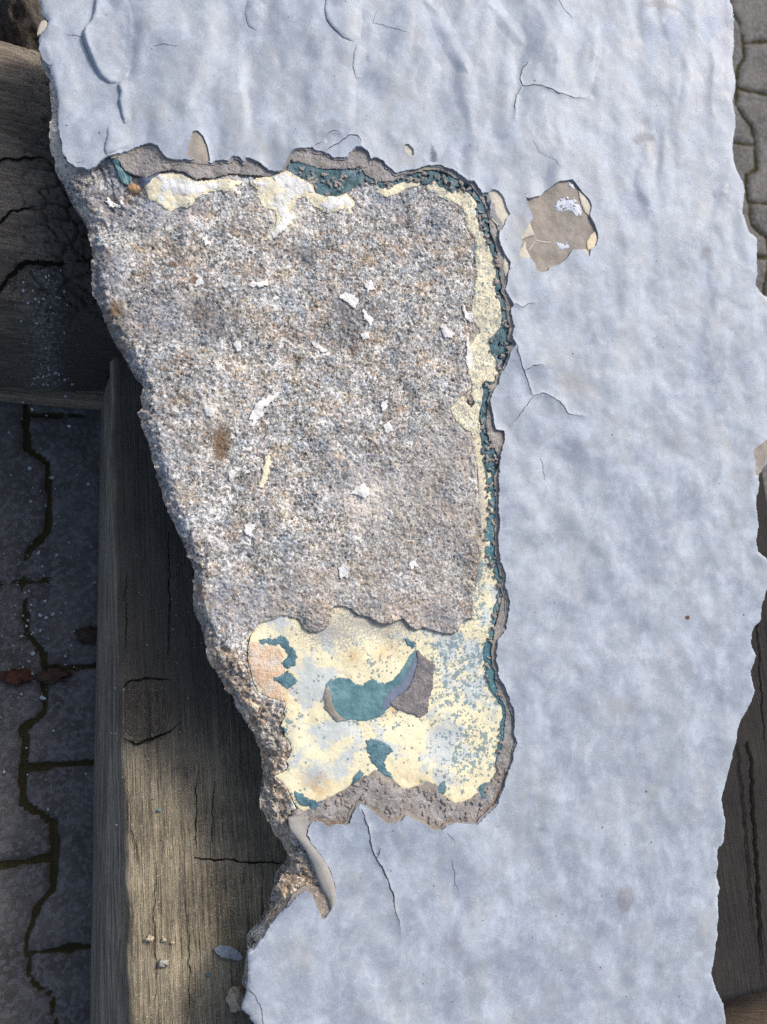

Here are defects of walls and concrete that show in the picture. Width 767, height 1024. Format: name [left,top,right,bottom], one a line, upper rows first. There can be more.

crack [514,62,590,113]
crack [517,344,578,417]
spalling [37,20,598,949]
peeling [2,526,78,675]
crack [361,809,400,925]